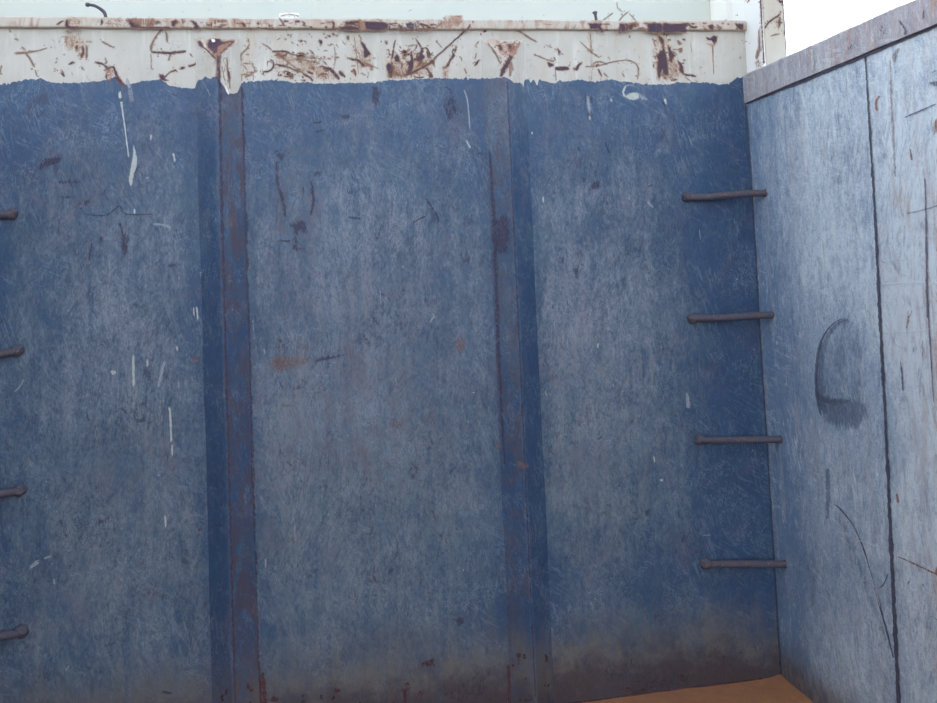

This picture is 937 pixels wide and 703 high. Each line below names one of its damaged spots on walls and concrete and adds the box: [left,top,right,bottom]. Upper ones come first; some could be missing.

rust [101,18,226,30]
peeling [198,38,234,58]
peeling [381,39,436,79]
peeling [488,42,520,80]
peeling [547,44,582,71]
rust [588,21,743,74]
rust [755,0,765,68]
rust [213,14,472,703]
rust [478,82,549,703]